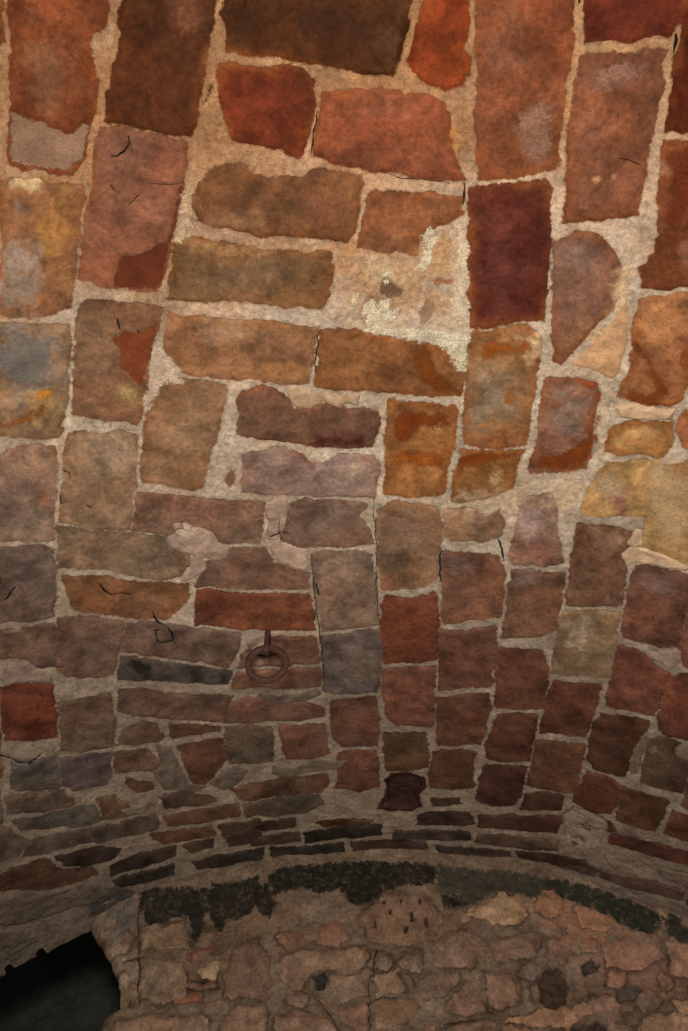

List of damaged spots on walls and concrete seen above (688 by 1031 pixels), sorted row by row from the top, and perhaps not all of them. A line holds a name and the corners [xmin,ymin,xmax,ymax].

crack [152,612,174,643]
crack [0,754,41,764]